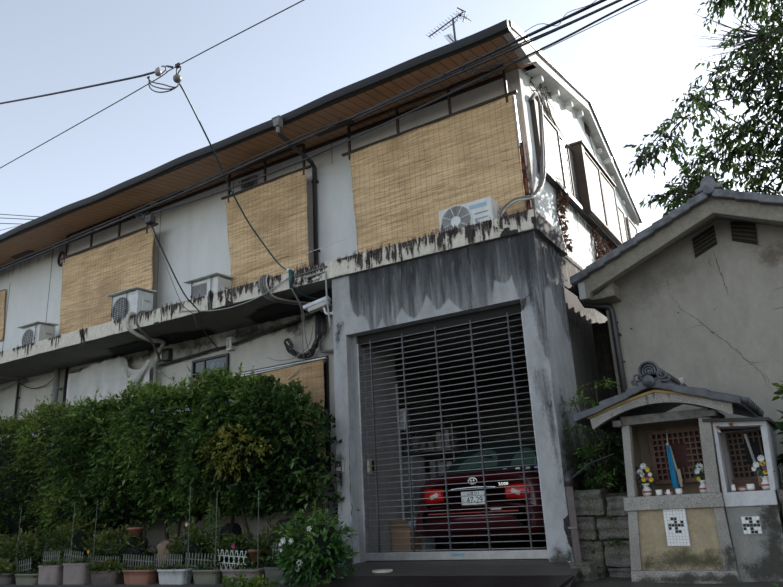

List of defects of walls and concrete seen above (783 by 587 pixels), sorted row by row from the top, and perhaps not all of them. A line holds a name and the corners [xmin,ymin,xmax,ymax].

damp [349,231,602,341]
crack [667,279,769,386]